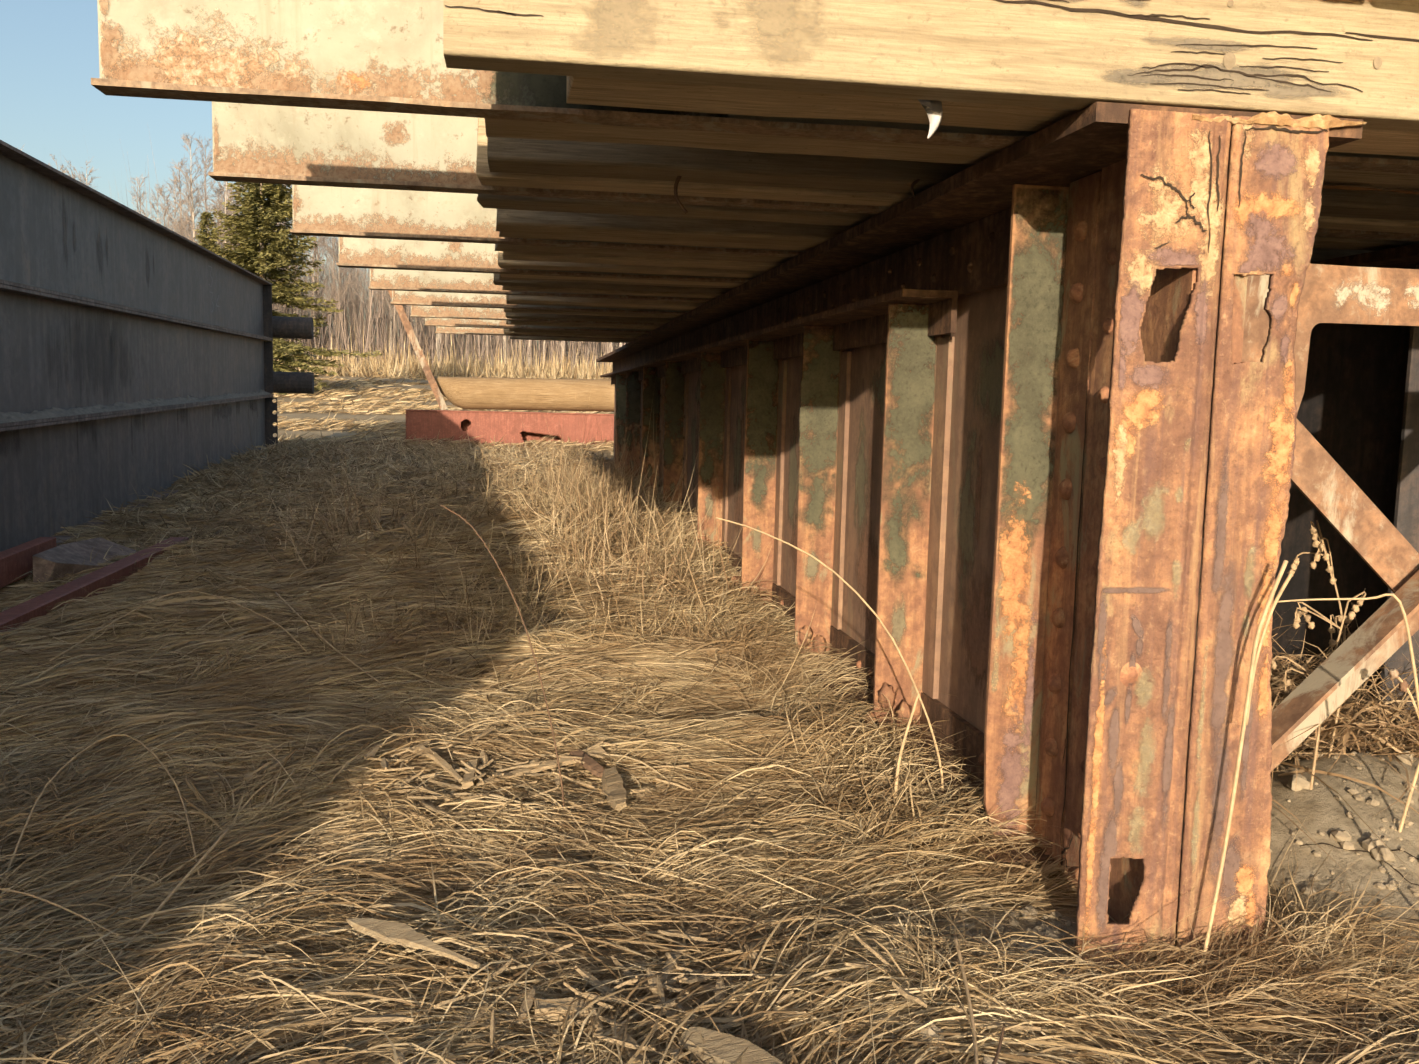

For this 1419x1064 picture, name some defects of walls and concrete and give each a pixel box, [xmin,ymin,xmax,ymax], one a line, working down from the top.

rust [99,0,123,77]
rust [214,121,530,334]
rust [337,61,499,104]
crack [445,5,544,17]
crack [996,0,1419,253]
rust [1126,124,1321,308]
rust [735,486,743,541]
rust [858,438,878,643]
rust [1113,387,1165,502]
rust [1257,359,1295,716]
rust [964,482,1036,836]